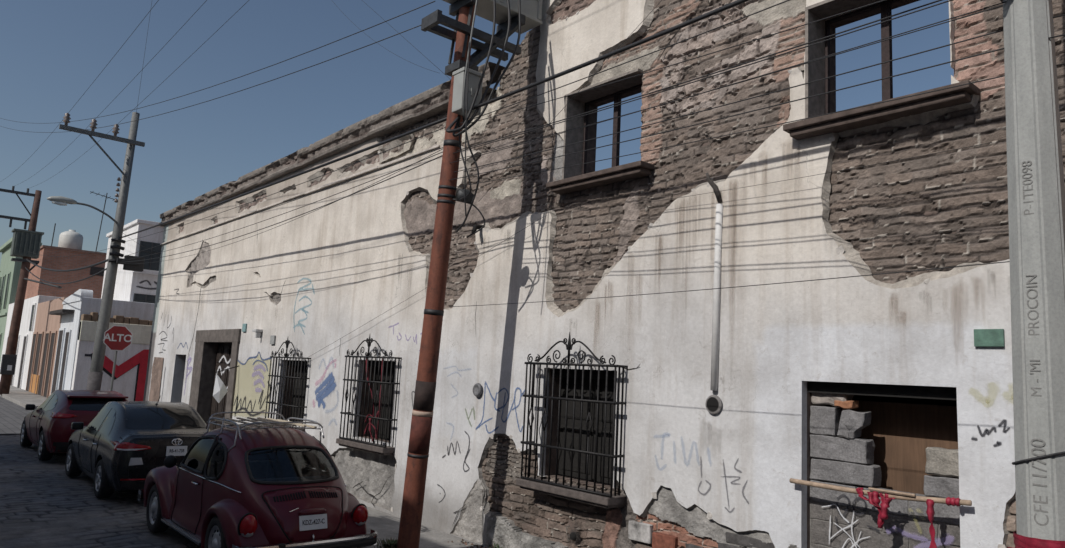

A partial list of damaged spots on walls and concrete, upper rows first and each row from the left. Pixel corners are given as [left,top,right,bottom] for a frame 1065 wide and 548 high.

spalling [236,111,448,213]
spalling [444,0,806,317]
spalling [822,0,1009,289]
spalling [1052,0,1065,185]
spalling [185,239,216,288]
spalling [401,187,437,293]
spalling [450,433,775,548]
spalling [997,490,1017,548]